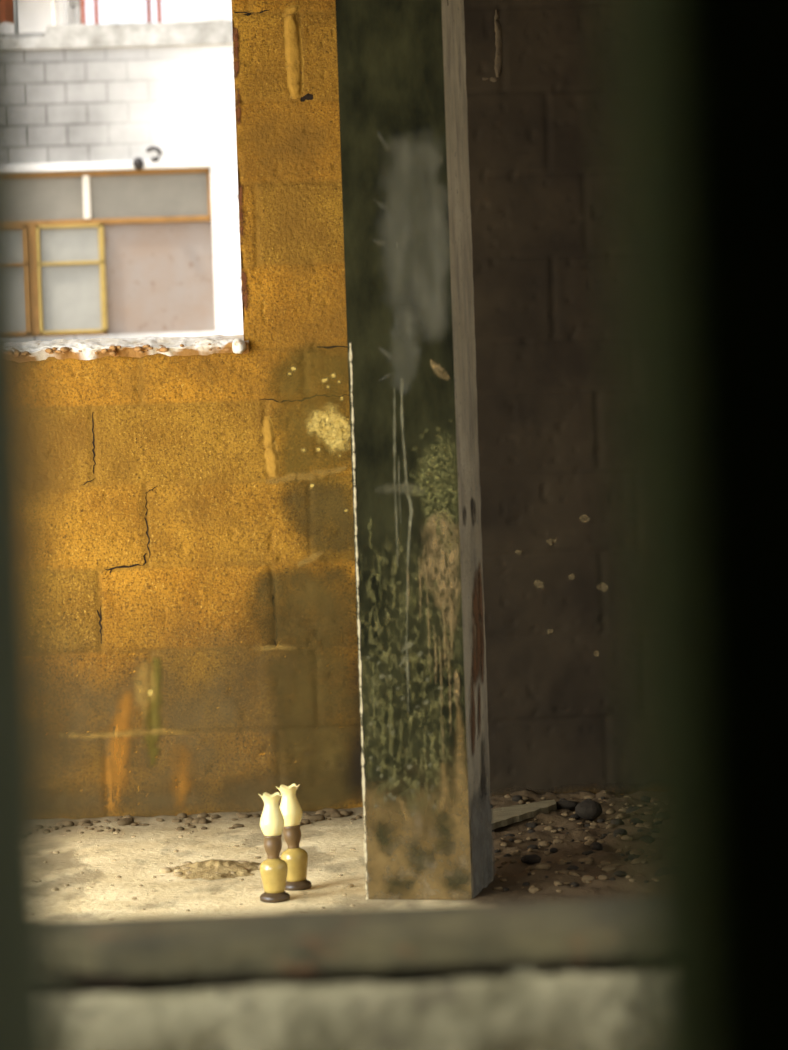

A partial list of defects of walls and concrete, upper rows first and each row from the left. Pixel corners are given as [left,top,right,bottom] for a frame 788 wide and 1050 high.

damp [302,0,495,894]
corrosion [106,696,129,808]
damp [46,644,344,813]